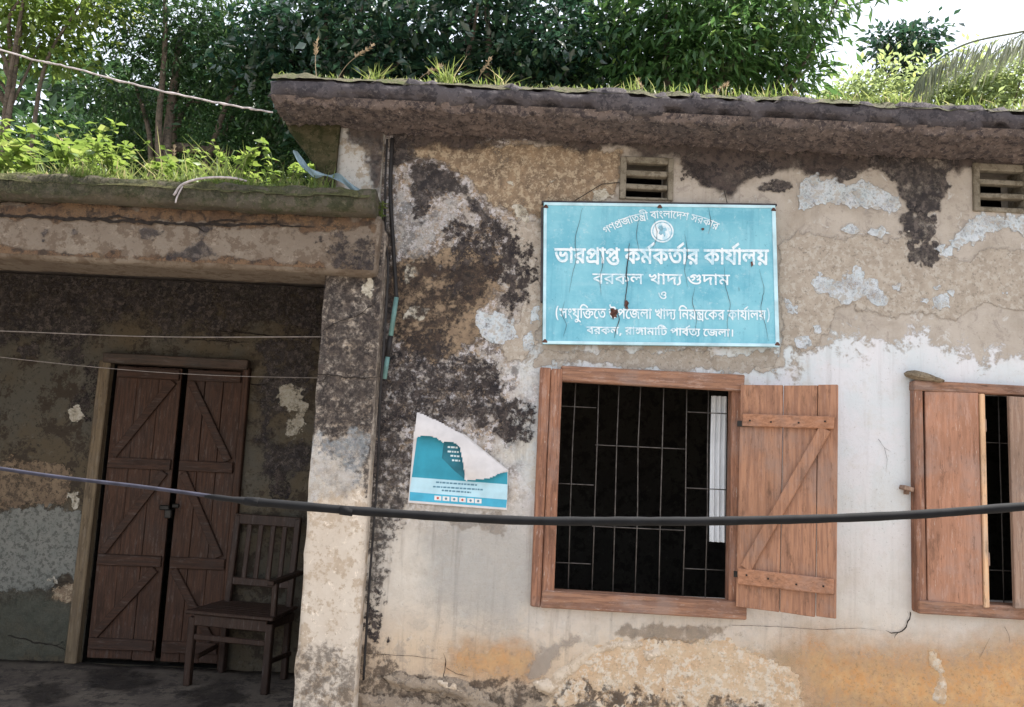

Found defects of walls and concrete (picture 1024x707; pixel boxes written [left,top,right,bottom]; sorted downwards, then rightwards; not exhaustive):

crack [0,213,309,232]
spalling [271,94,1024,374]
leakage [535,140,1024,268]
peeling [68,404,85,422]
leakage [0,128,540,707]
peeling [276,383,309,440]
peeling [0,454,81,603]
crack [738,612,911,638]